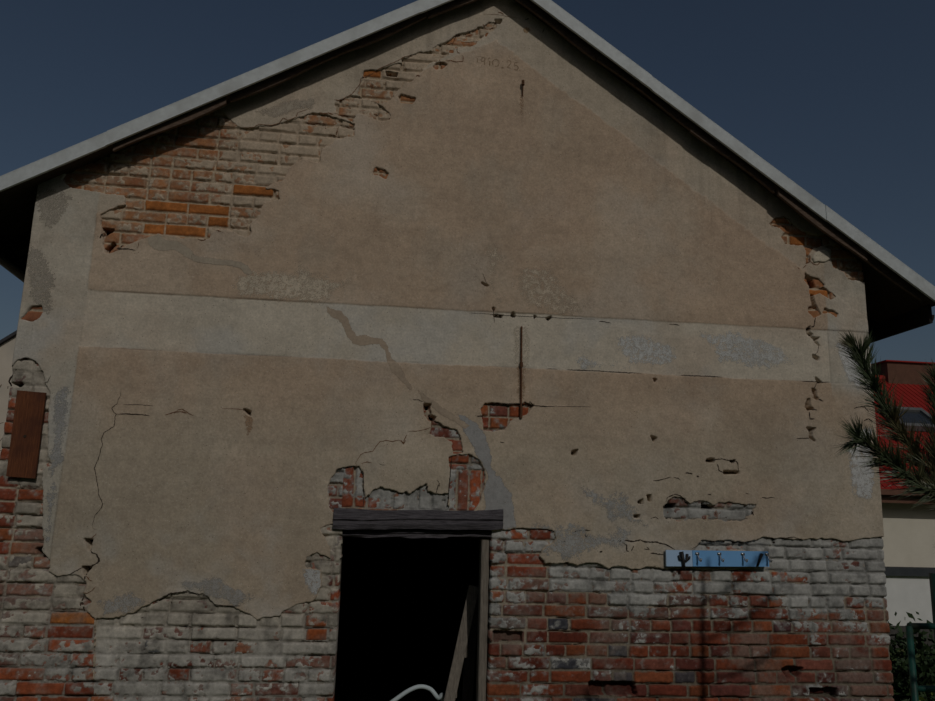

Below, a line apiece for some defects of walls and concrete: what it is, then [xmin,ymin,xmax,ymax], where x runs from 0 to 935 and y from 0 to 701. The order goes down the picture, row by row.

spalling [63,23,496,253]
spalling [22,306,43,322]
spalling [770,218,864,282]
spalling [804,278,837,318]
crack [71,393,194,611]
spalling [0,358,344,701]
spalling [327,406,485,512]
crack [327,307,585,506]
spalling [481,403,533,432]
spalling [663,497,755,522]
spalling [486,528,894,701]